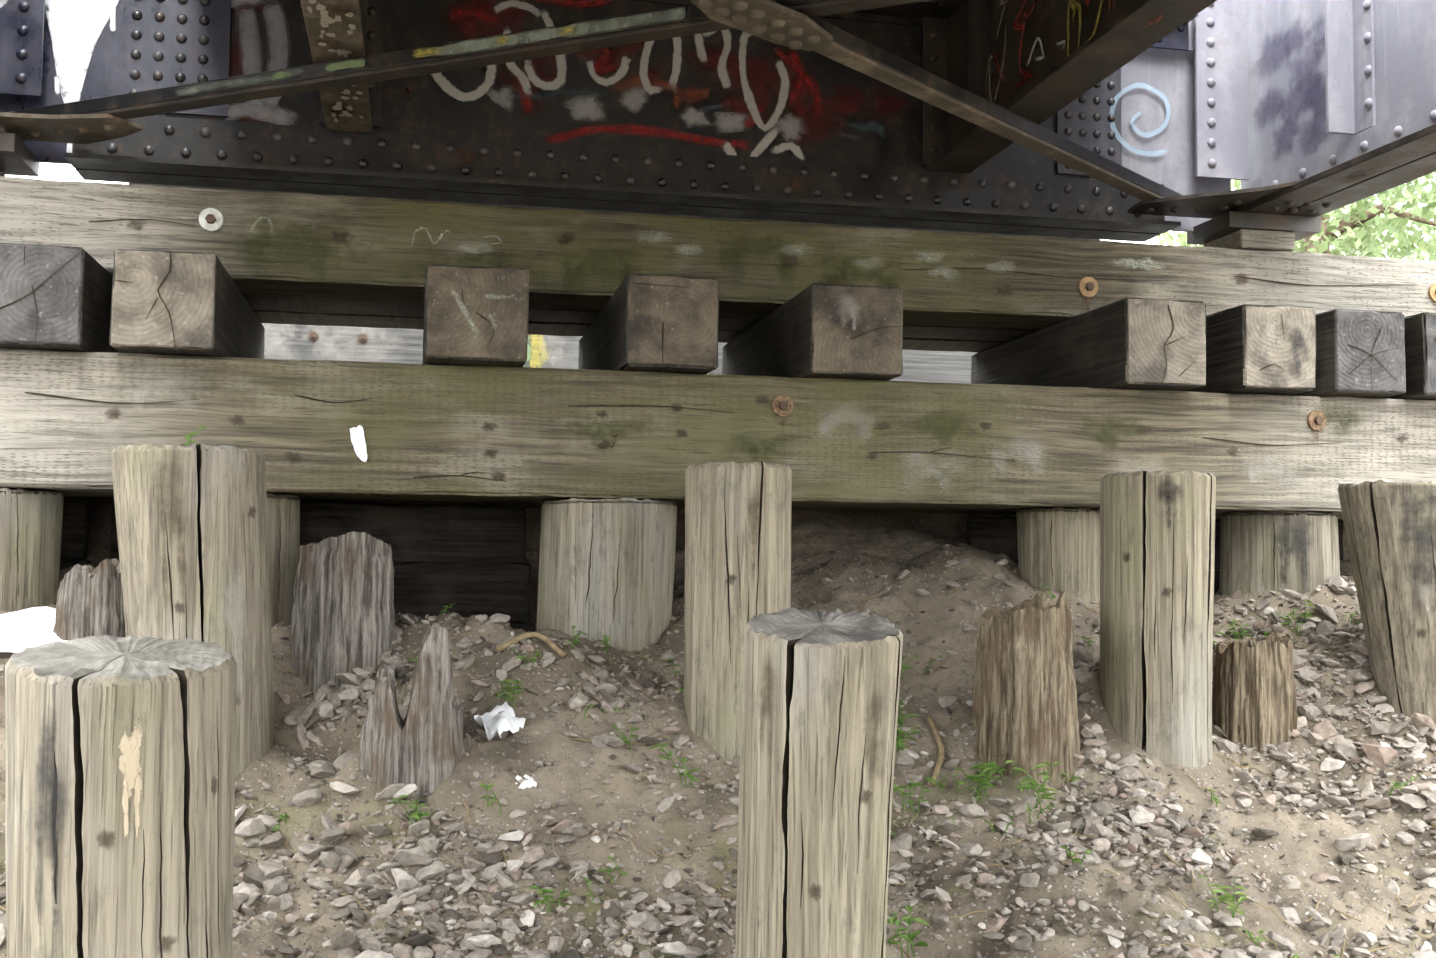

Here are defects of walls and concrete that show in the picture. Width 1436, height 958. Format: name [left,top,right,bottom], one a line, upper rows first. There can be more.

peeling [306,0,356,58]
peeling [331,85,364,123]
crack [0,219,195,348]
crack [25,392,199,404]
crack [902,264,1196,386]
crack [243,507,281,629]
crack [724,461,764,665]
crack [1142,437,1332,749]
crack [1346,482,1407,713]
crack [52,672,93,958]
crack [141,444,220,958]
crack [781,634,900,958]